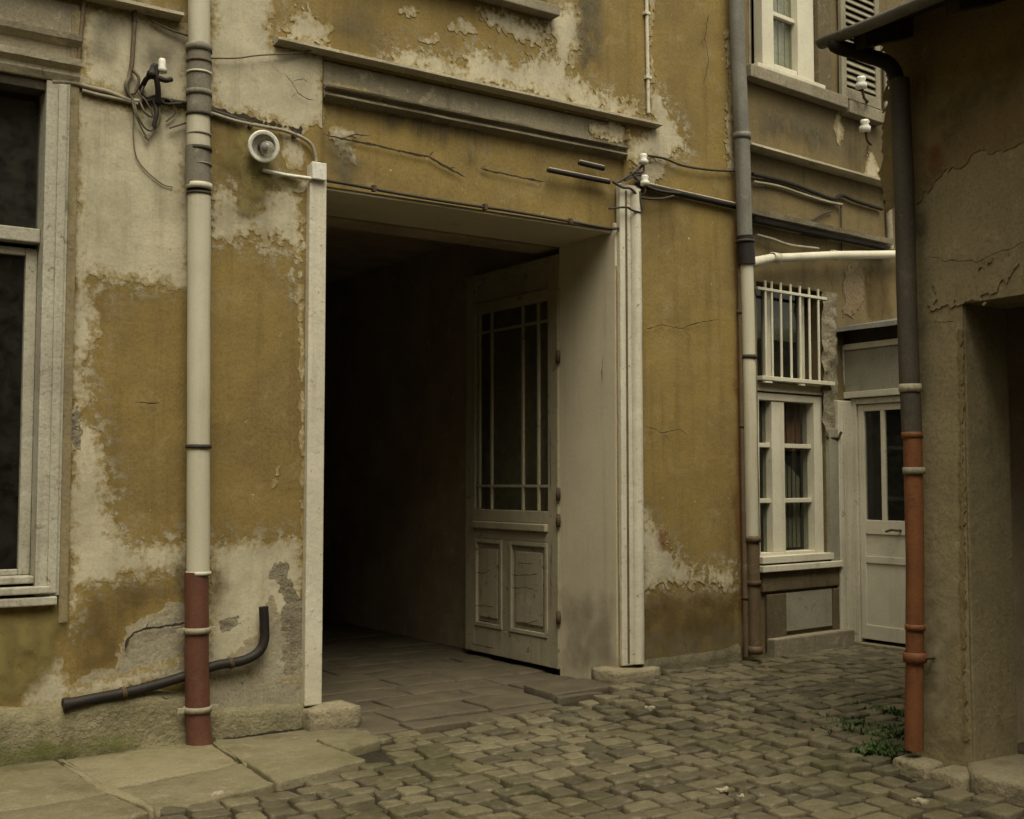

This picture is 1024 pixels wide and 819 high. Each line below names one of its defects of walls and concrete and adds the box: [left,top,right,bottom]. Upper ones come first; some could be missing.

peeling [371,0,695,184]
crack [324,134,544,182]
peeling [68,1,188,641]
peeling [209,0,371,684]
peeling [644,508,741,603]
peeling [20,653,184,707]
crack [125,622,184,651]